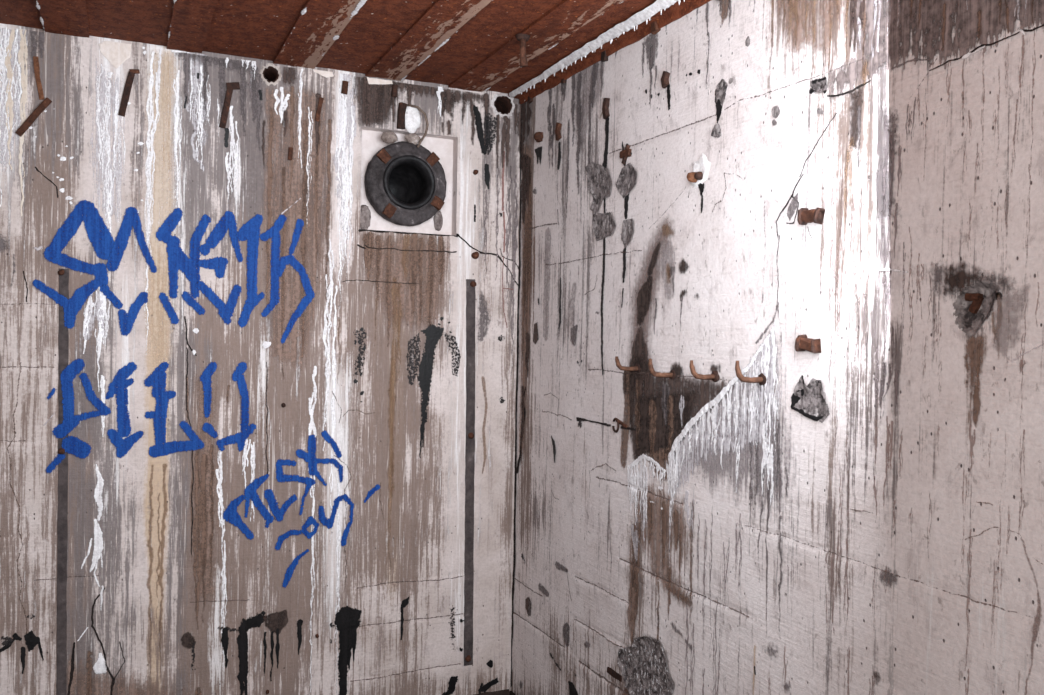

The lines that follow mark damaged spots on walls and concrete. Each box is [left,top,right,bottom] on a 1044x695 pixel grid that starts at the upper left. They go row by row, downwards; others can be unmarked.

leakage [697,2,710,83]
crack [0,362,125,695]
leakage [144,0,685,692]
spalling [585,161,636,248]
leakage [627,321,796,695]
crack [756,112,837,344]
spalling [791,375,830,423]
leakage [825,412,850,633]
leakage [828,0,1044,520]
spalling [953,276,1001,338]
spalling [617,636,674,695]
leakage [1025,594,1041,695]